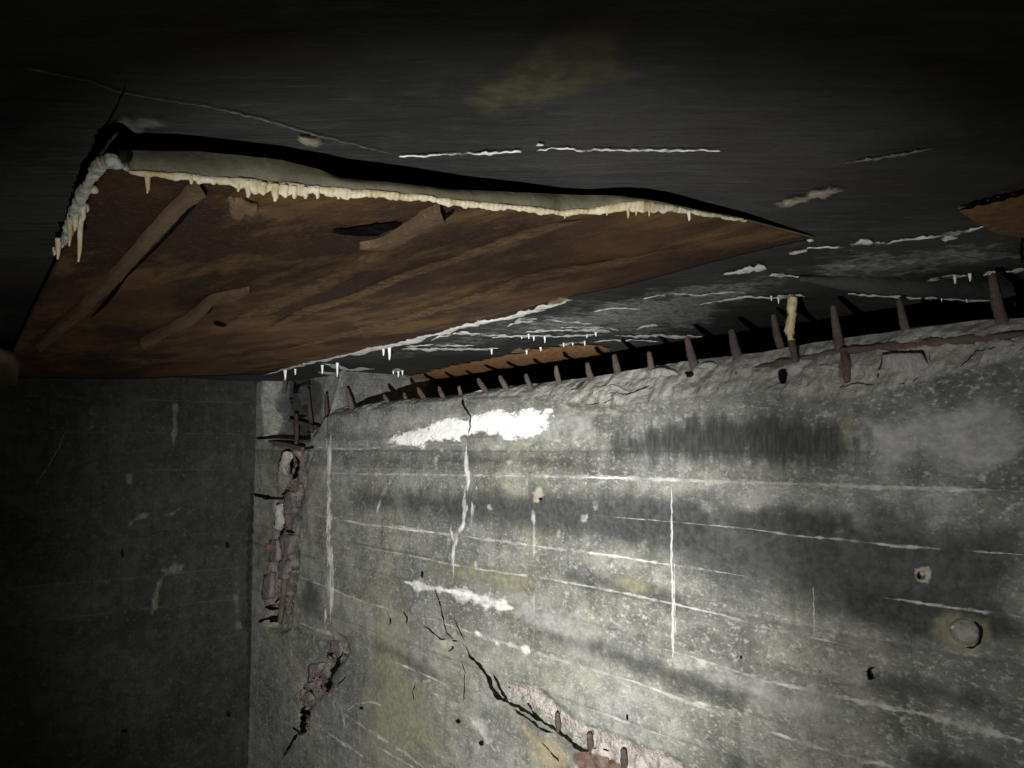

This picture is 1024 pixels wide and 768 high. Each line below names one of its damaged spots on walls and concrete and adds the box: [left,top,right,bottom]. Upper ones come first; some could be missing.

crack [6,64,721,158]
water stain [52,152,747,262]
crack [118,149,1024,249]
water stain [266,244,1024,380]
spalling [324,274,1024,418]
crack [458,395,471,434]
spalling [253,413,308,624]
water stain [314,406,621,638]
spalling [282,634,350,760]
crack [388,590,621,766]
spalling [503,683,686,768]